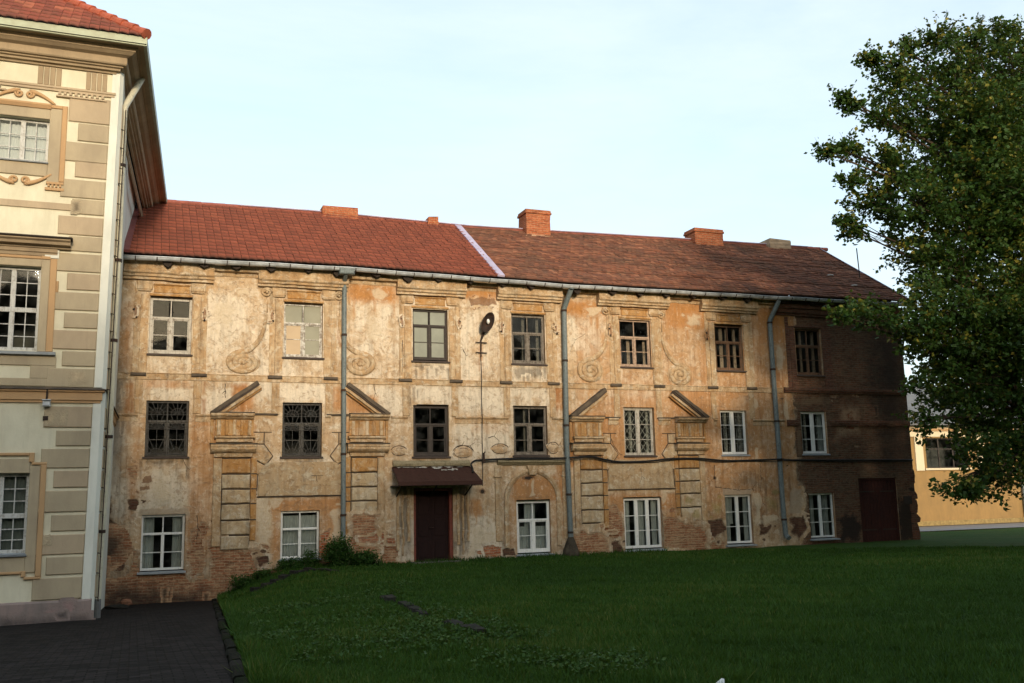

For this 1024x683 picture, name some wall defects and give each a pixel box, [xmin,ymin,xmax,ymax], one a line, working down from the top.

spalling [712,316,868,545]
spalling [109,459,286,611]
spalling [314,501,413,566]
spalling [566,522,626,554]
spalling [660,489,729,550]